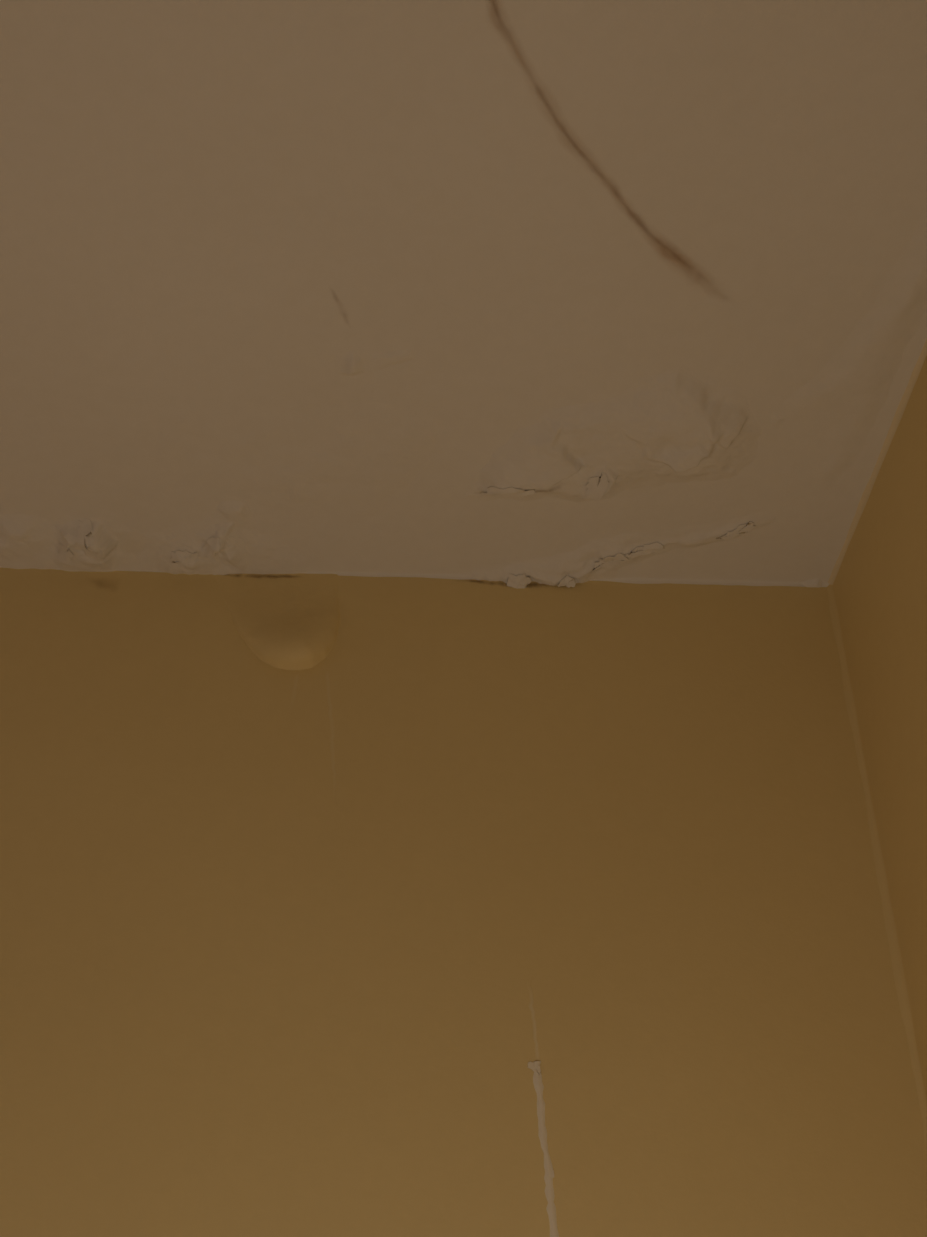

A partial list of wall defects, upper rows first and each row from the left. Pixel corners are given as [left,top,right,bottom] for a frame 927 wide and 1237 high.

spalling [0,501,311,575]
peeling [465,511,776,589]
crack [527,980,559,1237]